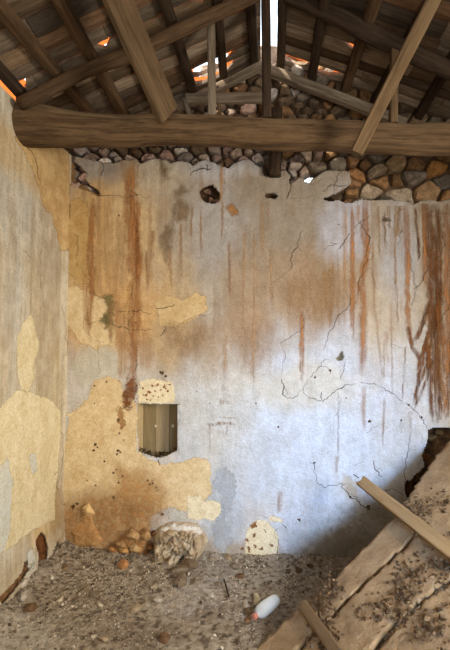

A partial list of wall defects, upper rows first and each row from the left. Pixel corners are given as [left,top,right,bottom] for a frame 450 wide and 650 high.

rust [116,167,140,430]
flaking render [15,136,269,351]
crack [281,208,427,427]
rust [350,211,370,366]
flaking render [281,151,450,204]
rust [396,205,450,413]
peeling [0,314,236,603]
peeling [240,515,283,555]
crack [310,462,363,506]
flaking render [405,427,450,500]